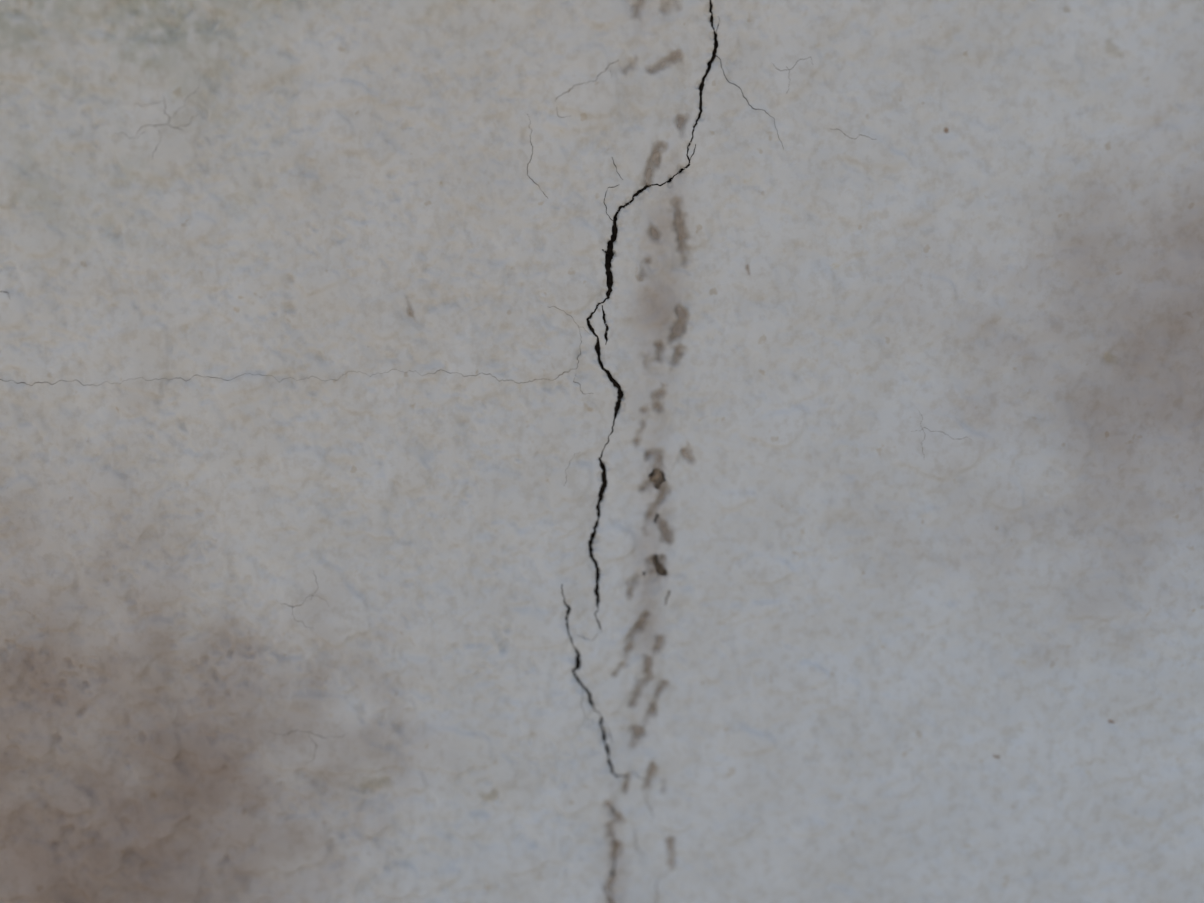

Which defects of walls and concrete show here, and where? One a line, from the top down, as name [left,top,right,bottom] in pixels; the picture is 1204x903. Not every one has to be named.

crack [0,0,812,903]